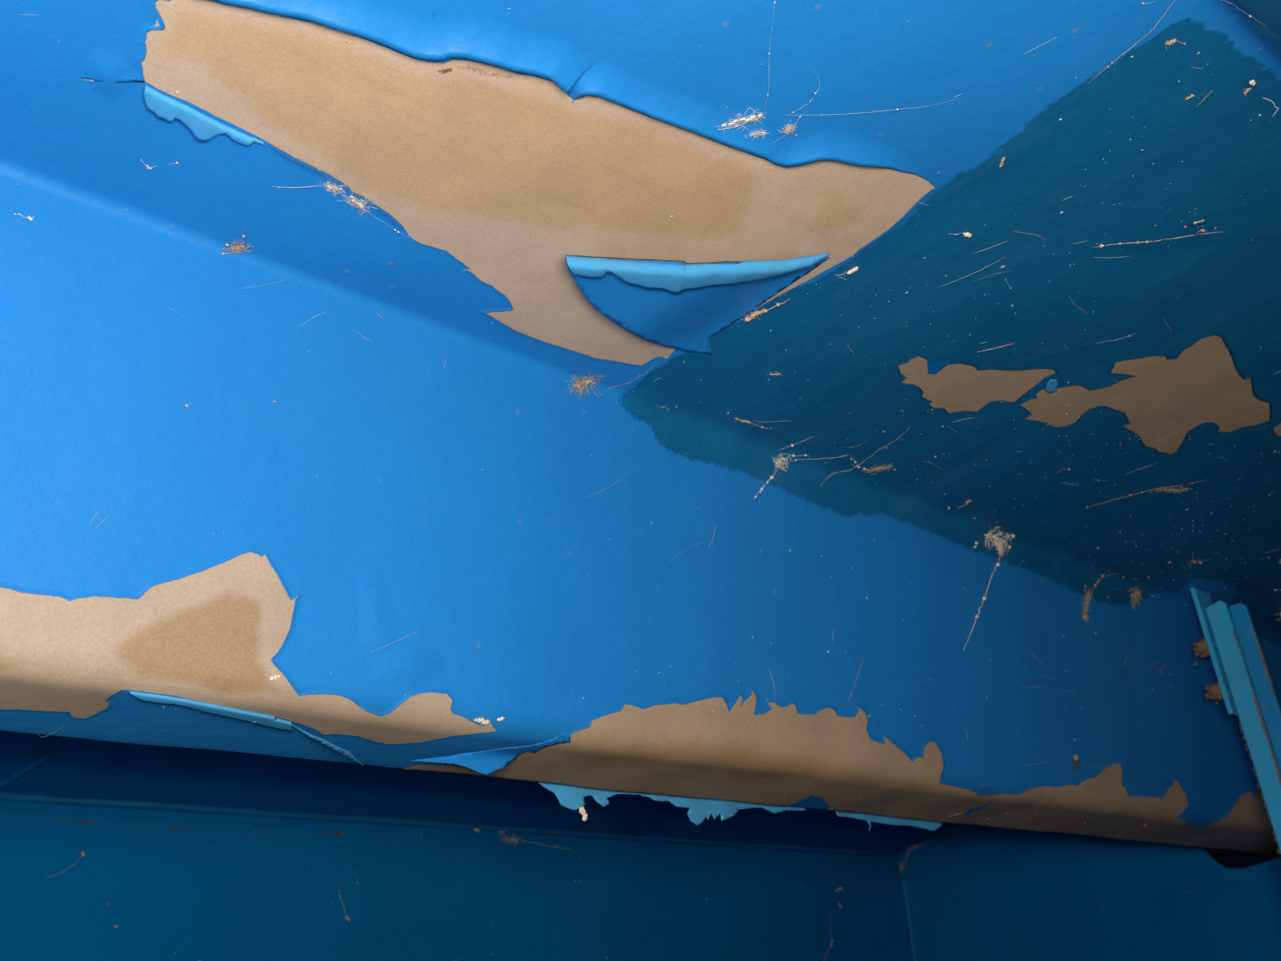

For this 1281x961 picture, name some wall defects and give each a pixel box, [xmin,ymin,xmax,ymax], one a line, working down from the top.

peeling [128,0,946,367]
peeling [897,333,1281,455]
peeling [0,546,1280,855]